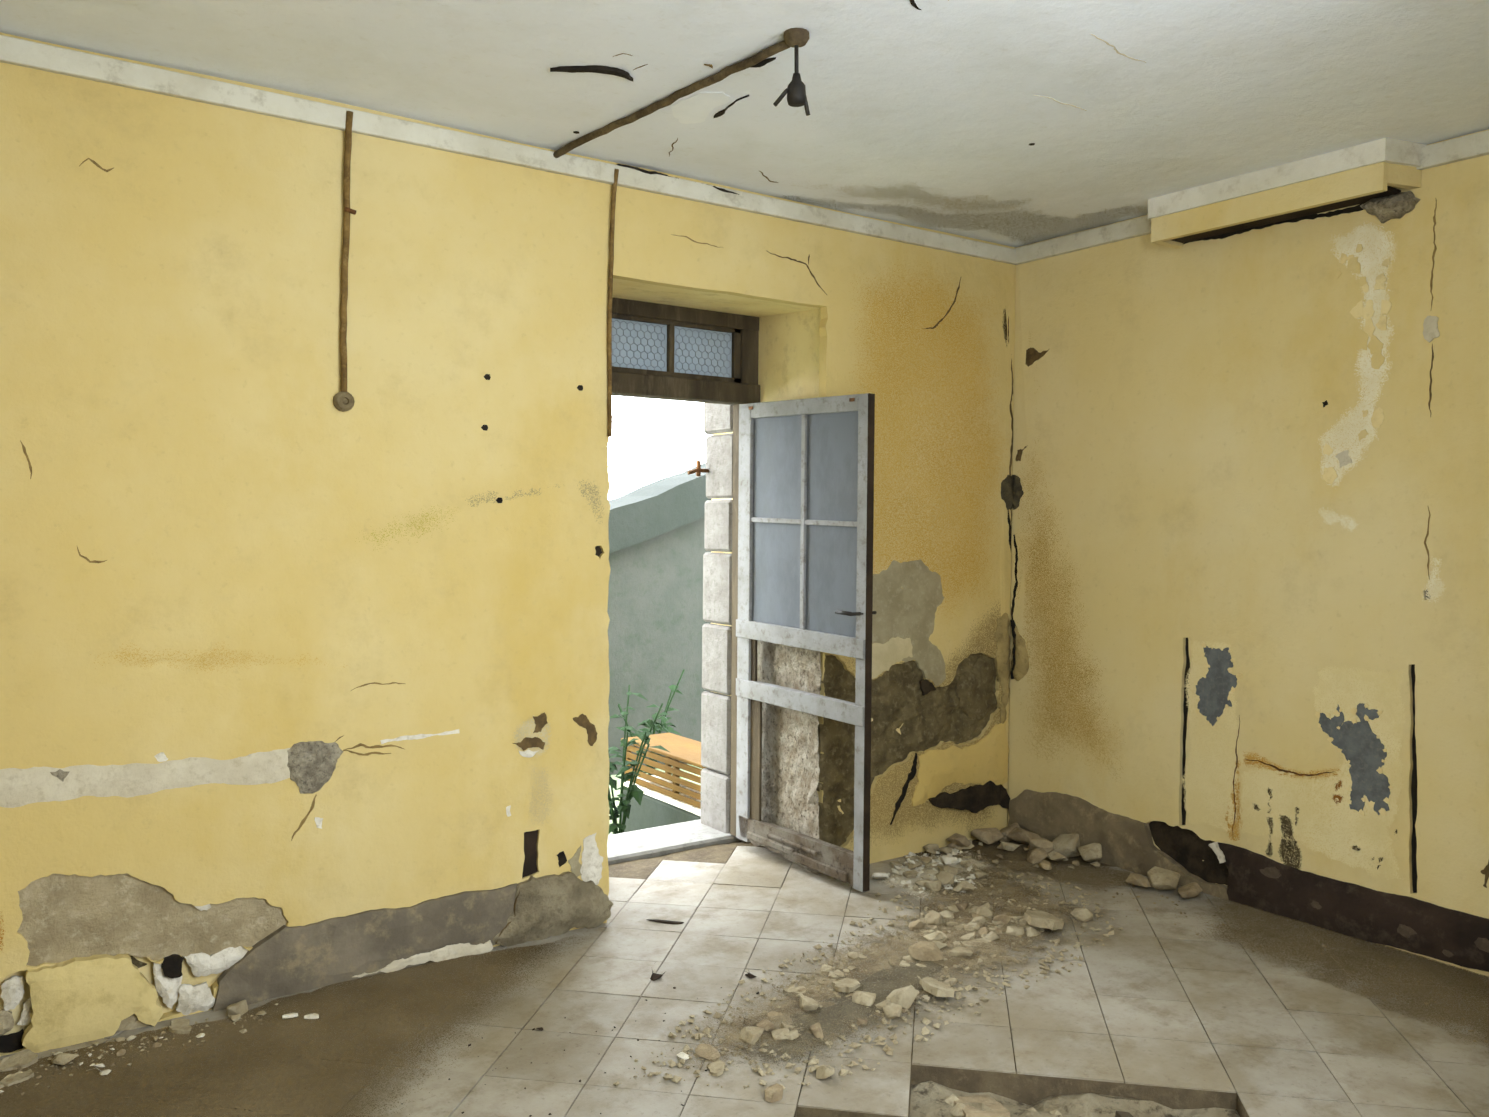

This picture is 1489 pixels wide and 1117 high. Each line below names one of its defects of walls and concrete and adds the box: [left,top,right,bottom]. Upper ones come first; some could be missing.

crack [766,250,827,295]
crack [925,278,961,329]
peeling [1317,191,1421,486]
crack [1423,200,1440,417]
crack [1008,317,1029,681]
spalling [757,559,1011,846]
peeling [1194,642,1243,726]
peeling [50,769,70,782]
peeling [1314,703,1393,816]
peeling [1209,842,1226,863]
flaking render [17,873,287,982]
spalling [0,1029,24,1053]